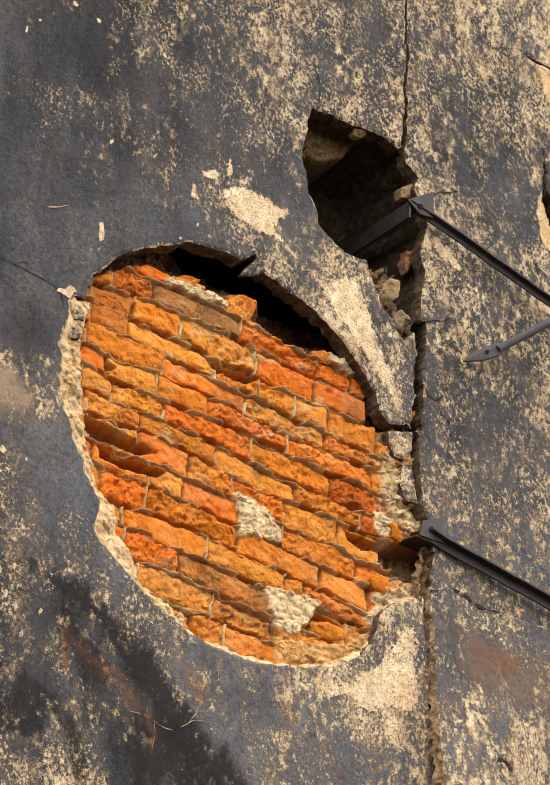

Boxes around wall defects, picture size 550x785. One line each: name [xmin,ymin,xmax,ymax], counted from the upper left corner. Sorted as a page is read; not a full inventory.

spalling [301,119,412,247]
crack [0,257,64,302]
spalling [353,215,420,344]
crack [398,315,469,440]
flaking render [57,248,424,719]
crack [411,546,504,614]